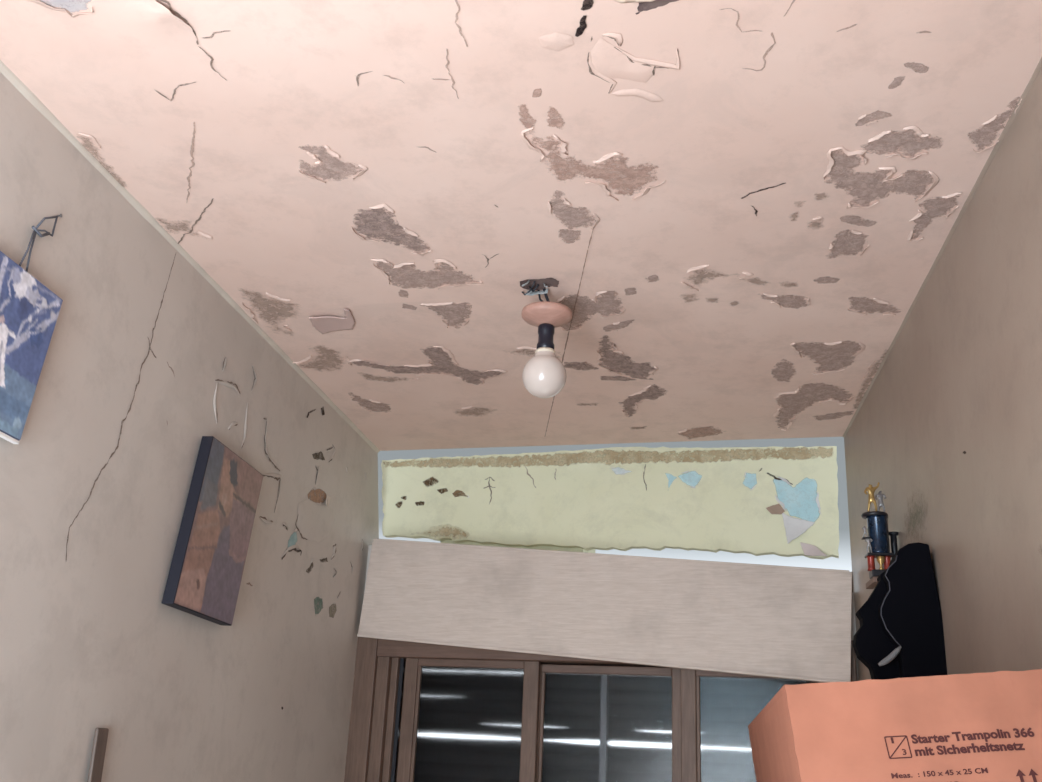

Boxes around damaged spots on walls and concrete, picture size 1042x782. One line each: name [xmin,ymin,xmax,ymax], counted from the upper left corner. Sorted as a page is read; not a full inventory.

peeling [28,0,197,50]
crack [156,0,226,100]
crack [435,0,468,97]
crack [733,0,795,71]
peeling [519,89,665,243]
peeling [817,111,962,258]
peeling [351,203,483,328]
crack [66,123,213,560]
peeling [293,309,508,384]
peeling [527,288,665,429]
peeling [771,341,886,431]
damp [388,447,832,468]